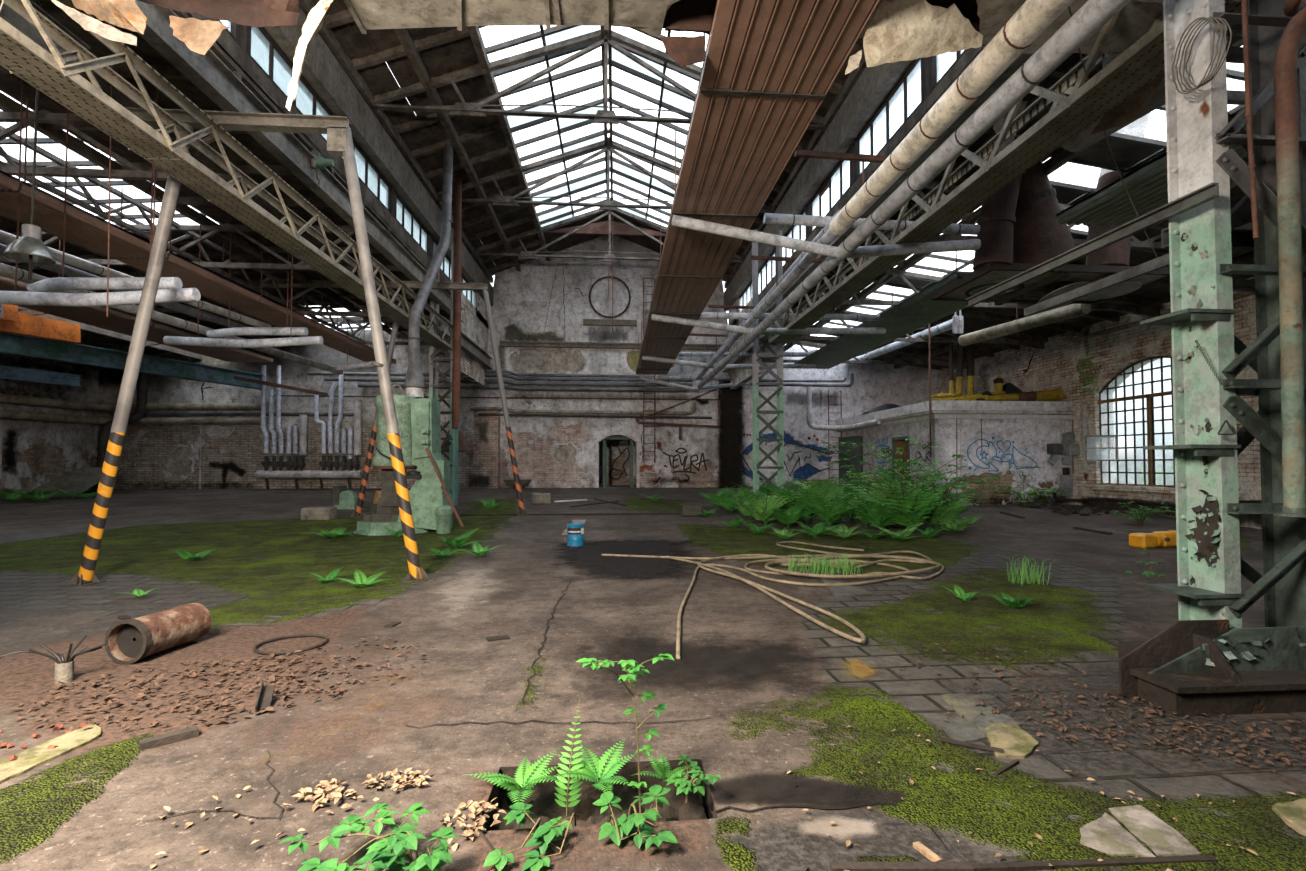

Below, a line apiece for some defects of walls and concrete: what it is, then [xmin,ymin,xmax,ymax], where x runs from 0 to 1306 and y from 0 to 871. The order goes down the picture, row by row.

peeling [1185,418,1221,588]